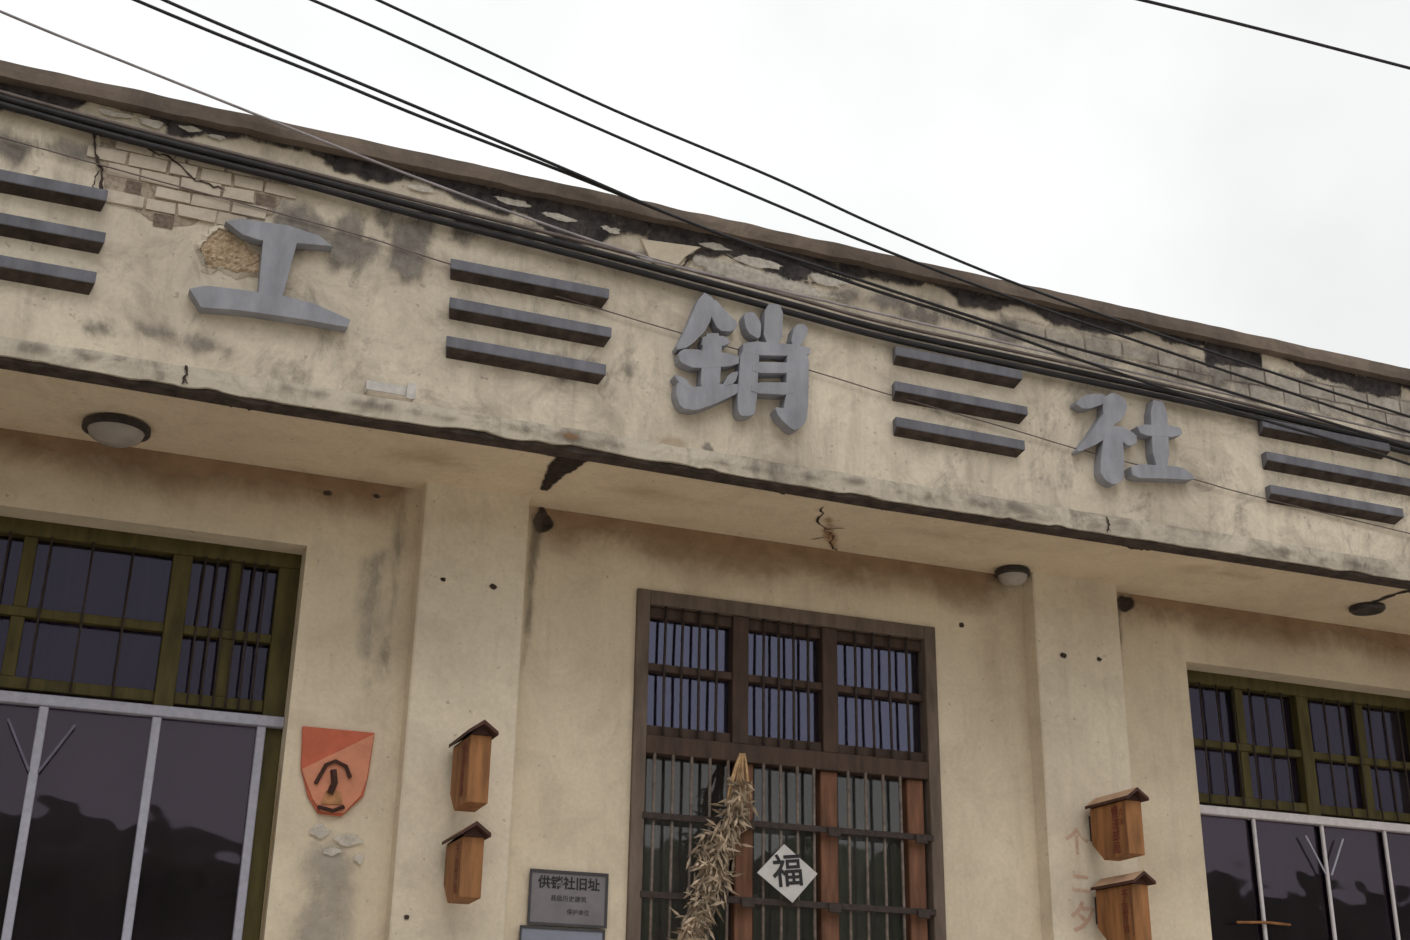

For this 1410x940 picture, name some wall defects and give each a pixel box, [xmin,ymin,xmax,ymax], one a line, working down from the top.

peeling [87,108,298,280]
peeling [407,184,435,192]
peeling [495,196,577,222]
peeling [641,239,848,299]
crack [811,507,845,551]